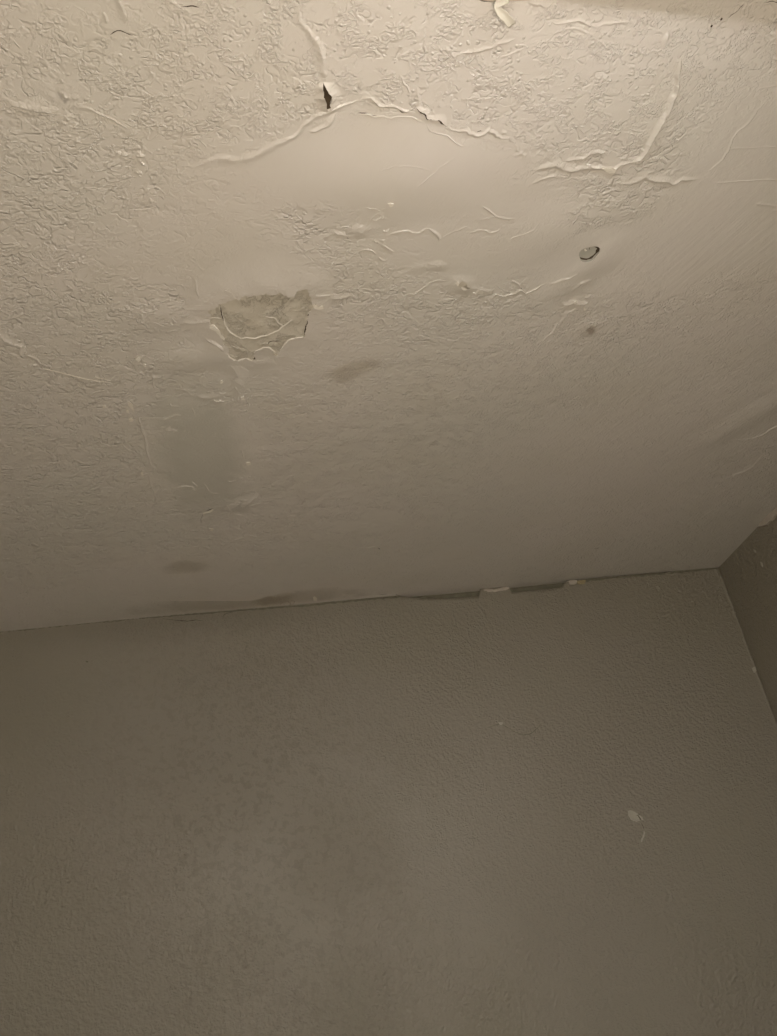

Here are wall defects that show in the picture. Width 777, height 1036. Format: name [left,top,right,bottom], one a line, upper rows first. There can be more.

crack [189,4,701,186]